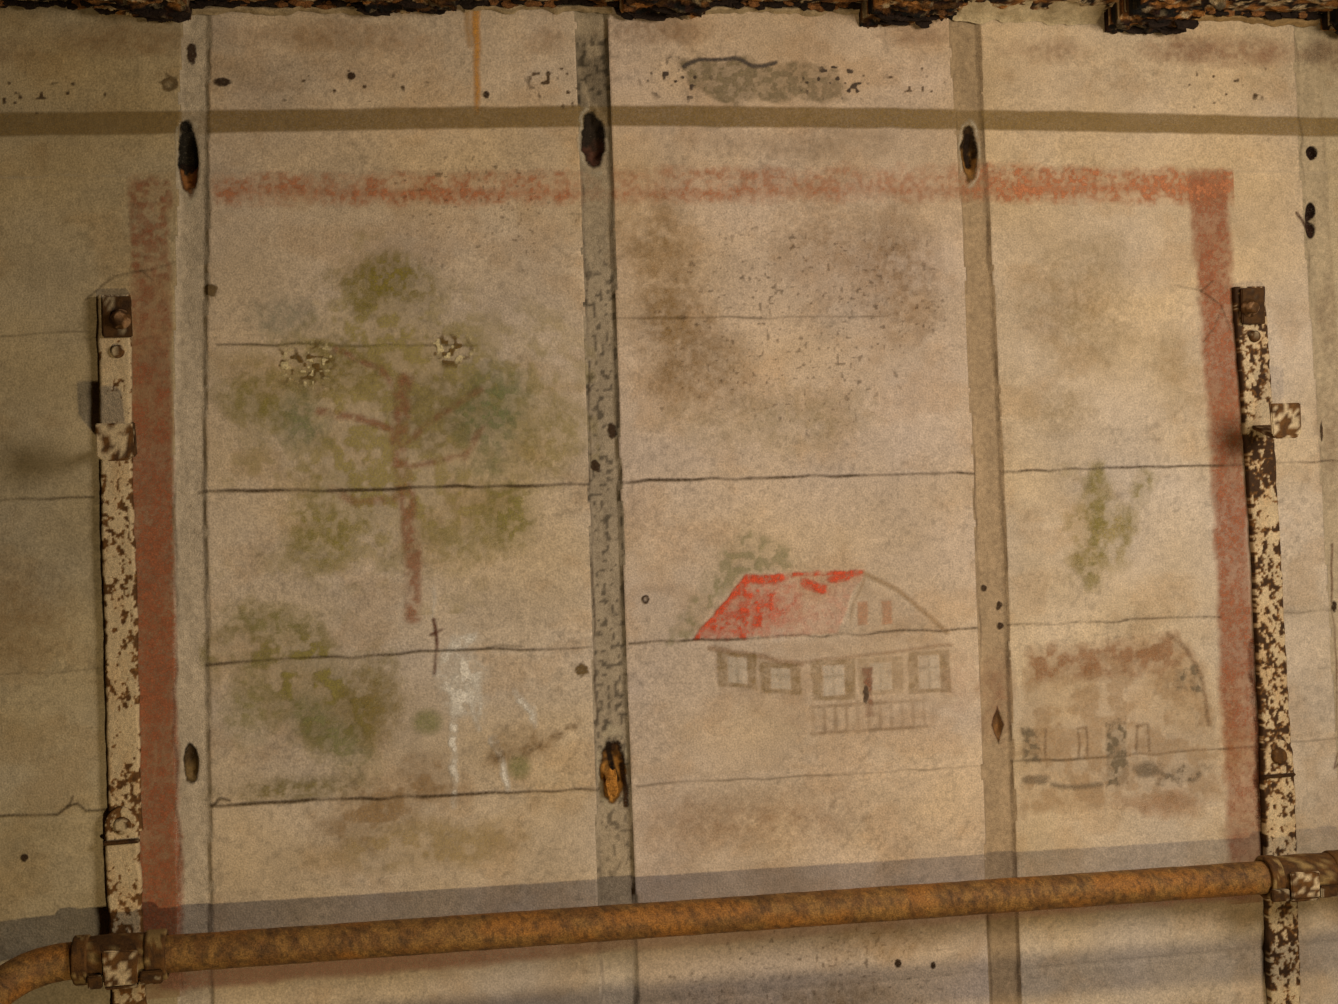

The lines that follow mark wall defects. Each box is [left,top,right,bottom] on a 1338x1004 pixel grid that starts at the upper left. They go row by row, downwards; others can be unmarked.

rust [596,727,629,807]
rust [1249,639,1261,825]